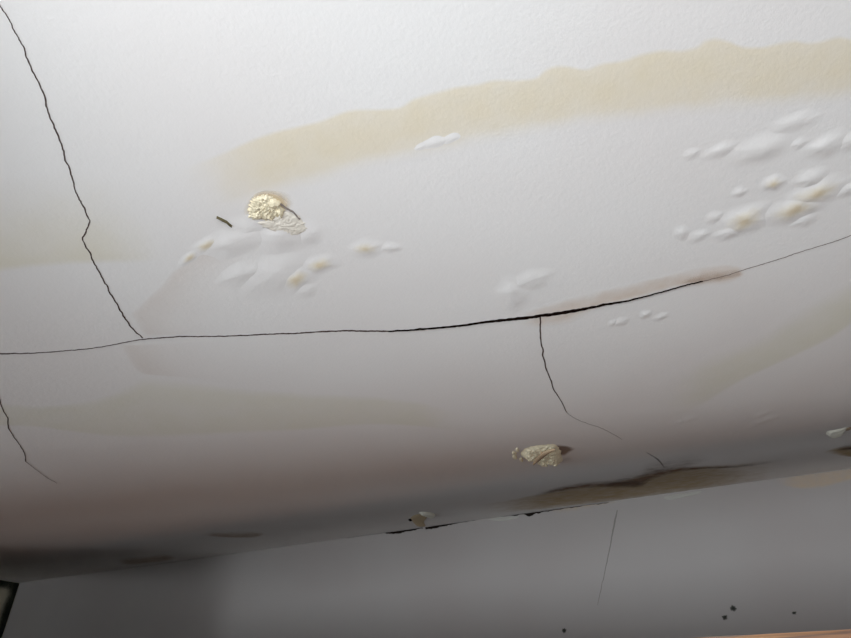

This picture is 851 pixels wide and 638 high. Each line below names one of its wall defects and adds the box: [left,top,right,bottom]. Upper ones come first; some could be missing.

spalling [247,194,307,235]
crack [0,6,851,439]
damp [0,34,851,439]
crack [0,401,55,482]
spalling [512,443,577,467]
damp [454,445,851,518]
mould [0,580,19,638]